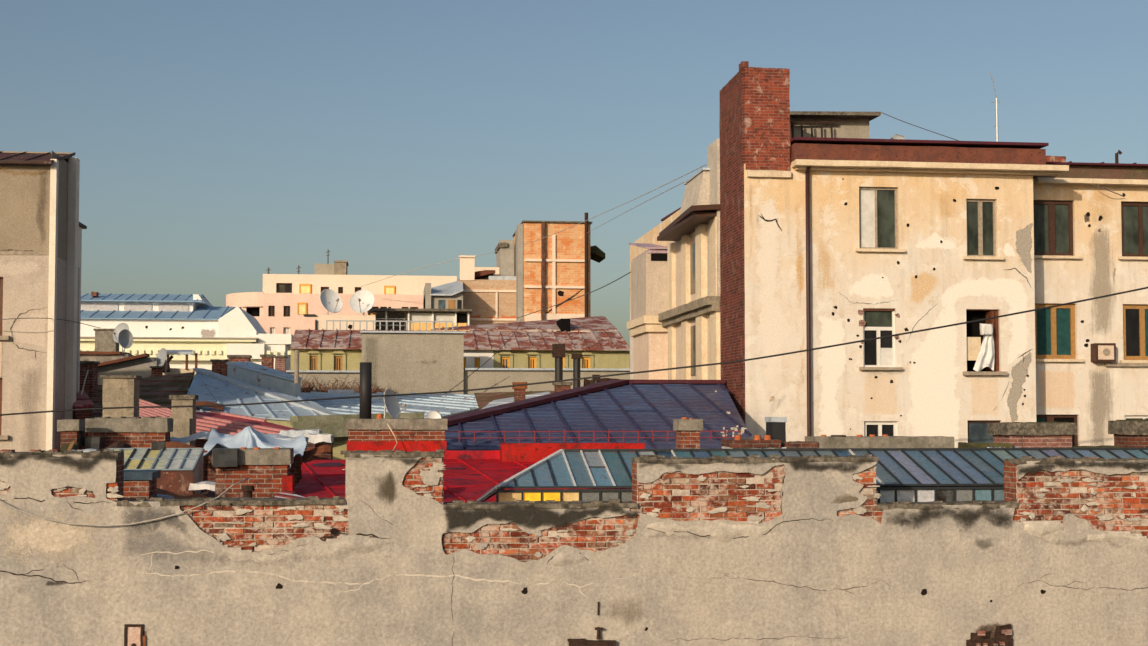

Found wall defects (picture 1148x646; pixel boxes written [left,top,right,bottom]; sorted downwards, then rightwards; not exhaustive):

peeling [915,232,955,251]
spalling [1003,224,1032,272]
damp [1084,191,1120,330]
crack [10,307,47,358]
peeling [818,314,847,436]
peeling [860,276,1031,448]
spalling [180,501,350,552]
spalling [402,457,446,503]
spalling [441,464,785,562]
spalling [1013,457,1148,539]
crack [0,501,636,646]